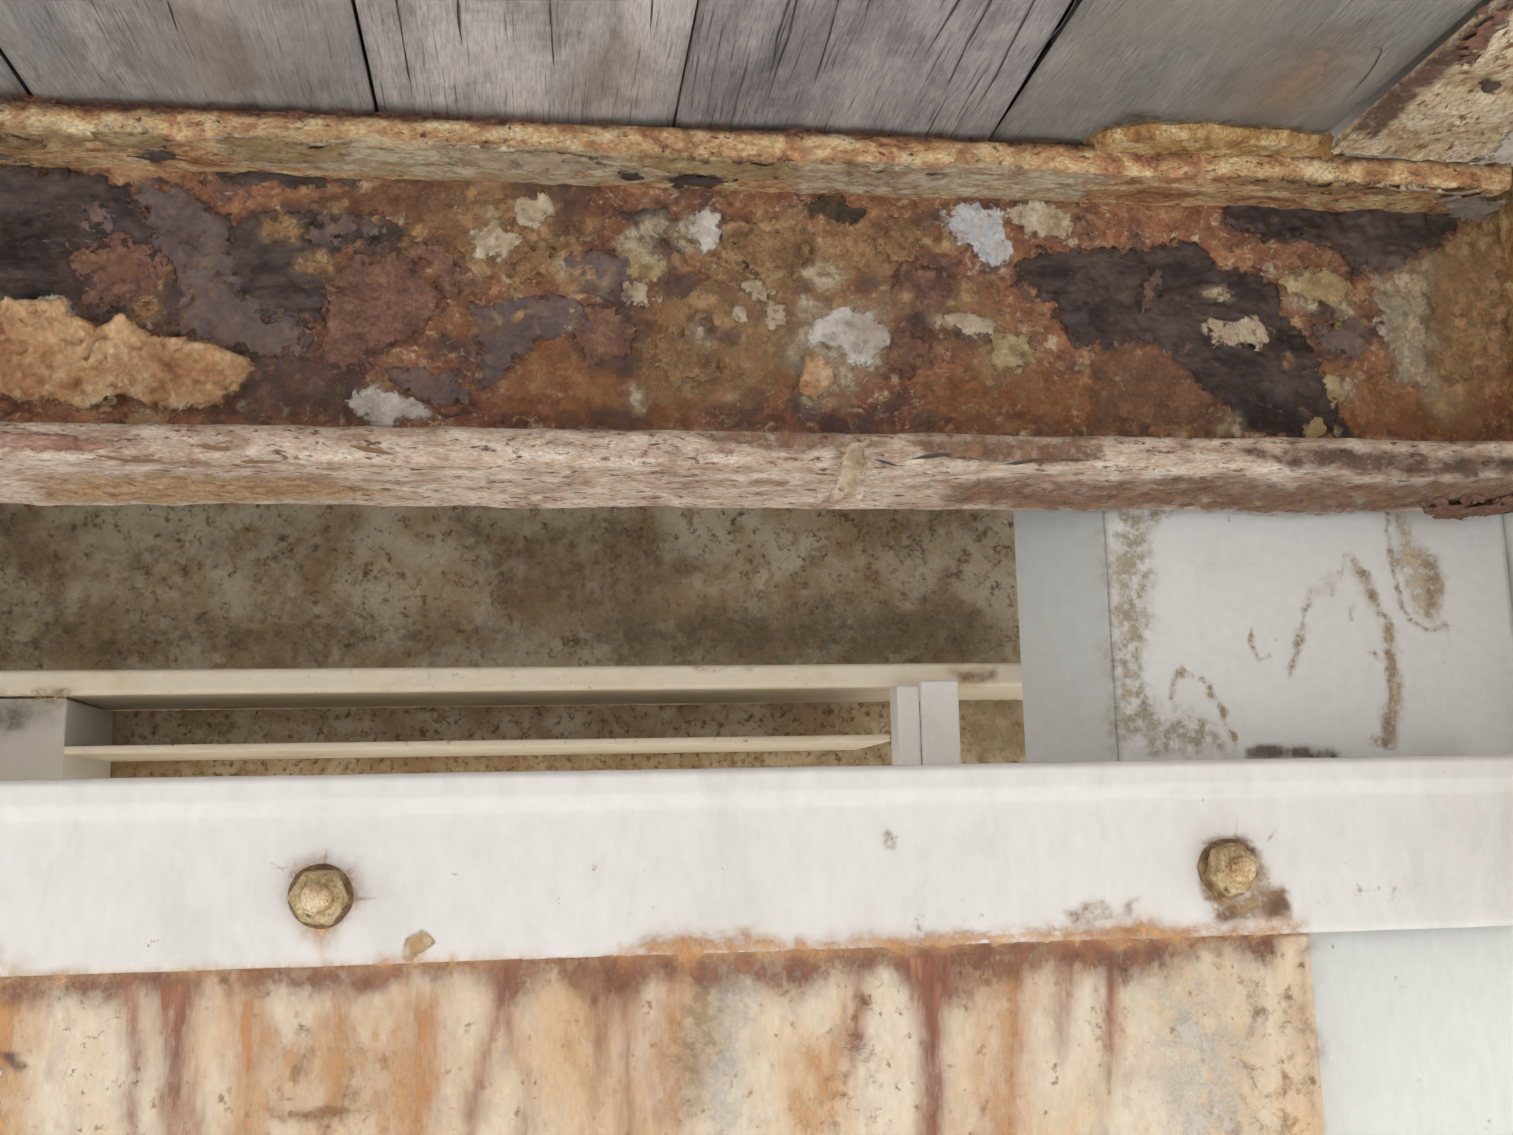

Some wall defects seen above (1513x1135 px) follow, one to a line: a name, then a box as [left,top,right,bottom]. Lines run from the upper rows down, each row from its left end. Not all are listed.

rust [196,104,550,126]
rust [1008,0,1513,163]
spalling [0,124,427,361]
rust [0,181,740,421]
spalling [215,132,1513,438]
rust [720,199,1045,407]
rust [1373,212,1510,423]
rust [0,431,113,452]
rust [911,438,1513,521]
water stain [1111,510,1220,746]
rust [0,971,197,1135]
rust [219,839,1299,1135]